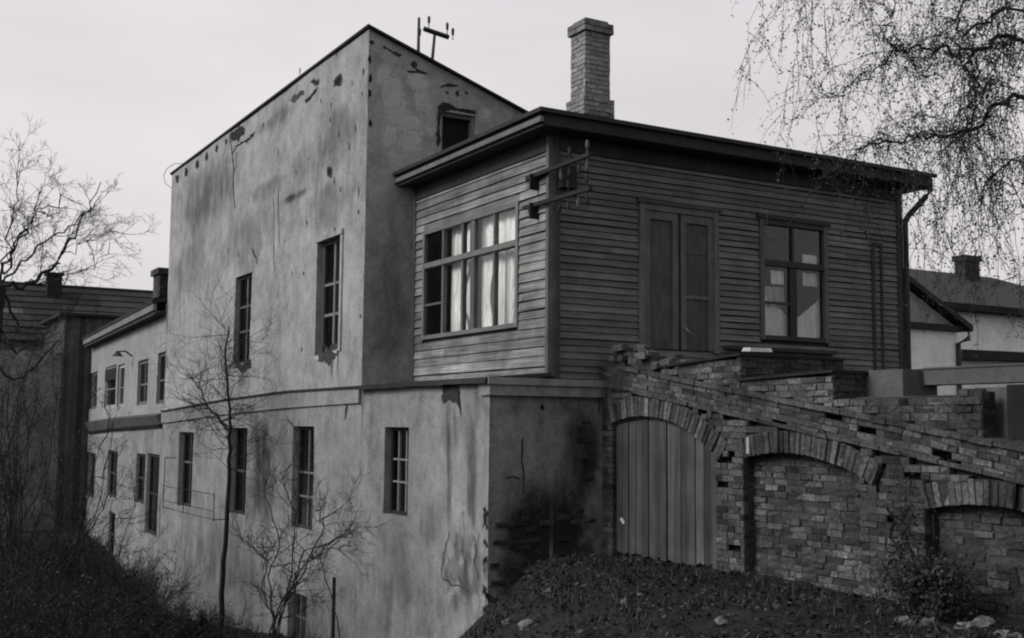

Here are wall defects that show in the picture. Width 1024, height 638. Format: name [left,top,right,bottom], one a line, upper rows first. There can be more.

peeling [289,69,332,122]
peeling [333,39,491,154]
flaking render [175,122,264,183]
crack [229,132,255,208]
flaking render [314,341,339,366]
peeling [442,384,461,415]
crack [506,438,524,499]
flaking render [441,498,597,615]